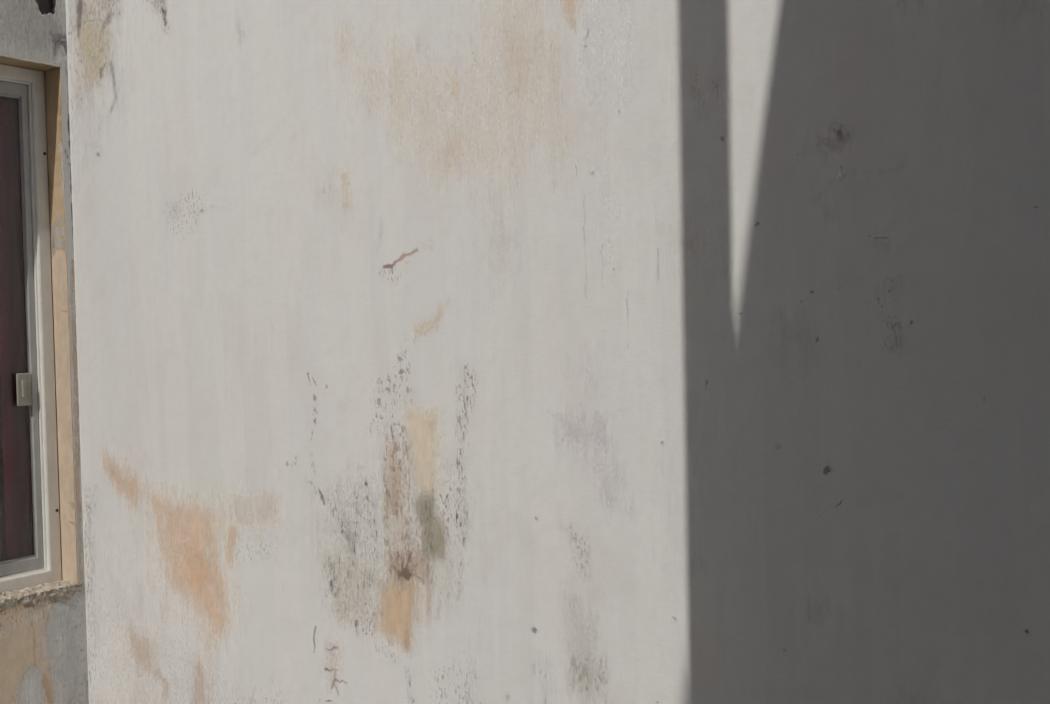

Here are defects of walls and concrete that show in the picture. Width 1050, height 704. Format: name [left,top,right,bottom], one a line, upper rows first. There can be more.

hole [35,0,56,15]
peeling [0,218,82,704]
peeling [145,496,235,634]
leakage [354,427,467,606]